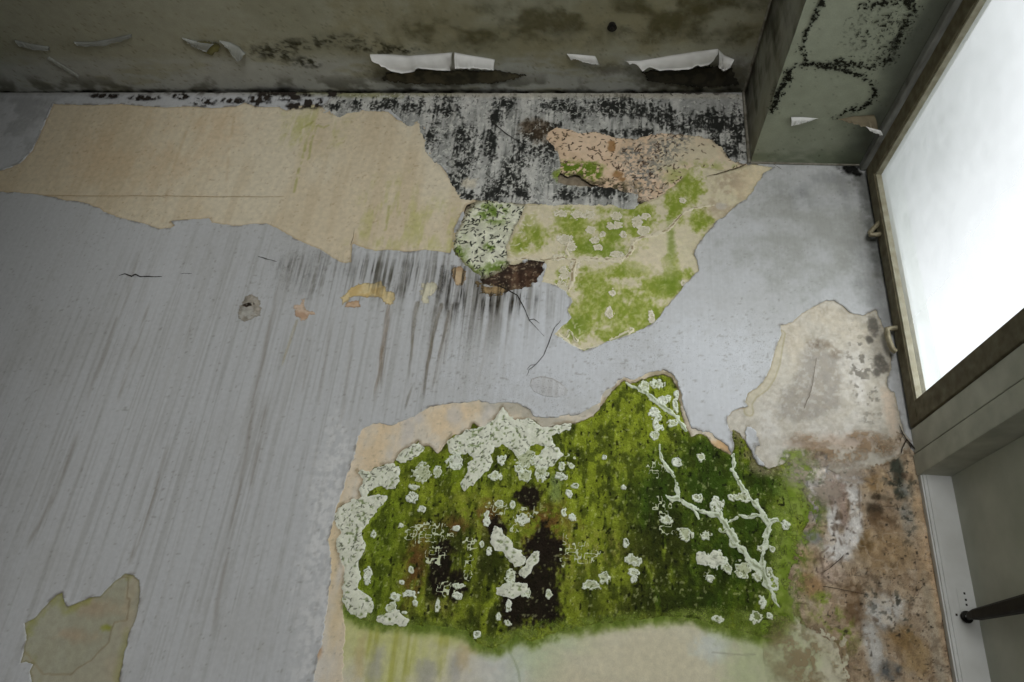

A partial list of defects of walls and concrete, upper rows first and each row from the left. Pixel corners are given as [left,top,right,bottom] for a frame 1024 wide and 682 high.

peeling [0,103,476,263]
peeling [370,52,526,85]
damp [0,0,924,210]
peeling [546,127,747,203]
peeling [626,49,739,88]
peeling [791,117,818,126]
damp [440,267,521,311]
spalling [451,260,545,297]
crack [498,285,561,373]
peeling [727,300,910,474]
damp [774,431,953,682]
peeling [21,574,140,682]